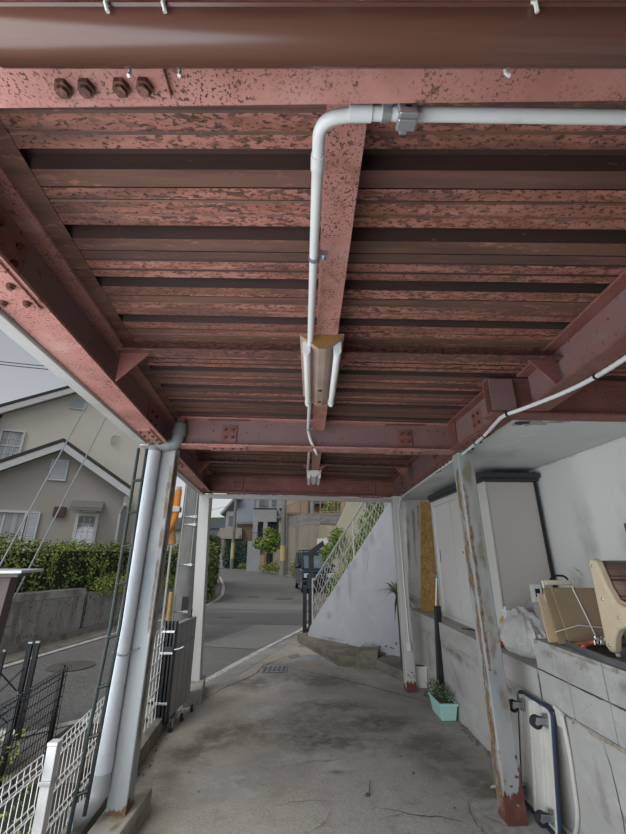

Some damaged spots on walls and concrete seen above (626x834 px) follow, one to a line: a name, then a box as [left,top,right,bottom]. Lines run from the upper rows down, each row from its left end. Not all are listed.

rust [163,456,177,518]
rust [139,529,168,736]
rust [456,466,504,812]
rust [104,798,134,829]
crack [380,805,506,834]
crack [604,747,626,832]